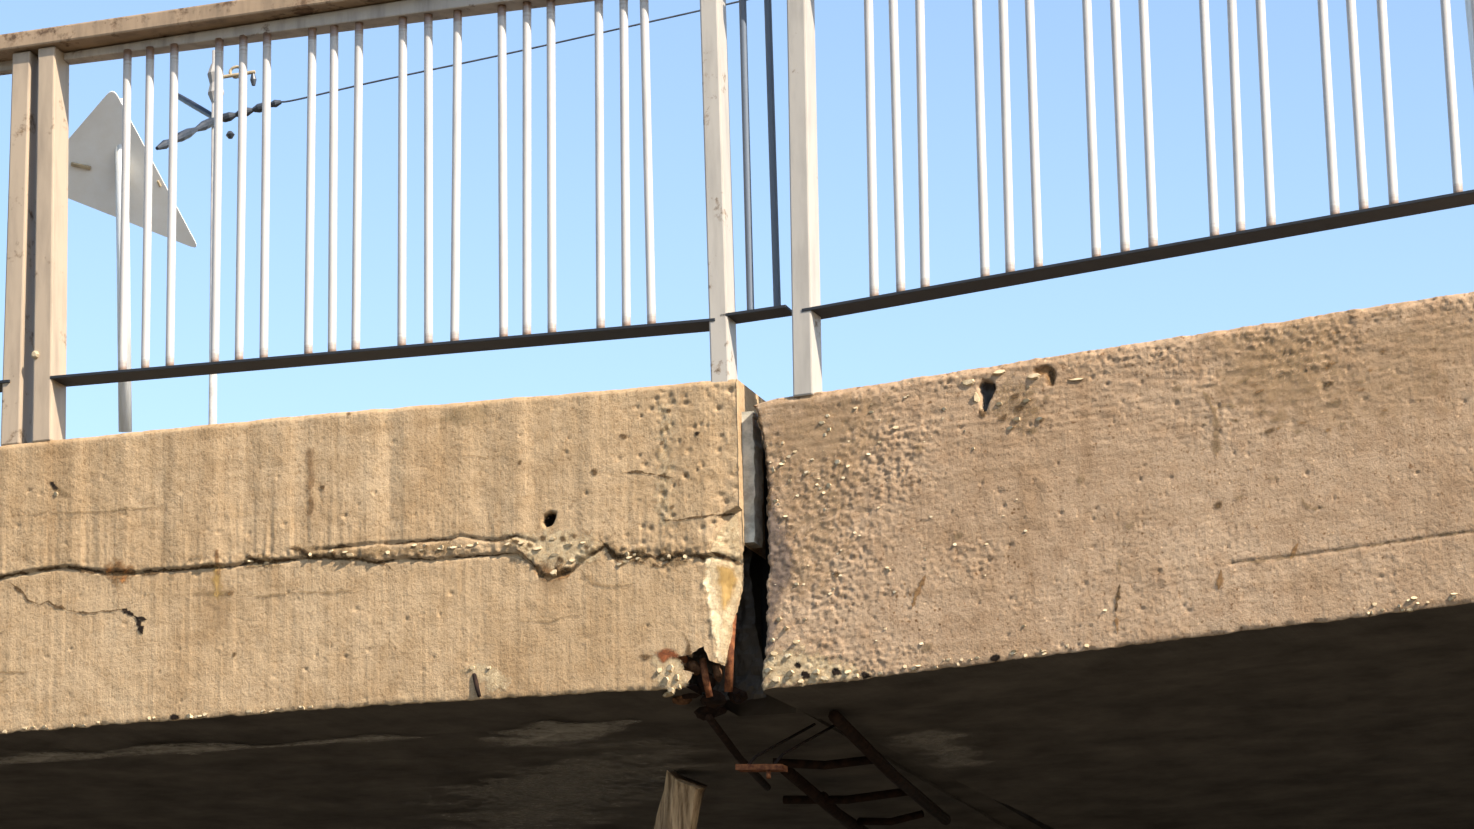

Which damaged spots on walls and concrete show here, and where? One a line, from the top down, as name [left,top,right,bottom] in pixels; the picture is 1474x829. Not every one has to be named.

spalling [961,365,1085,434]
crack [627,470,672,479]
crack [28,507,149,515]
crack [0,513,735,622]
spalling [291,542,478,561]
spalling [504,402,951,829]